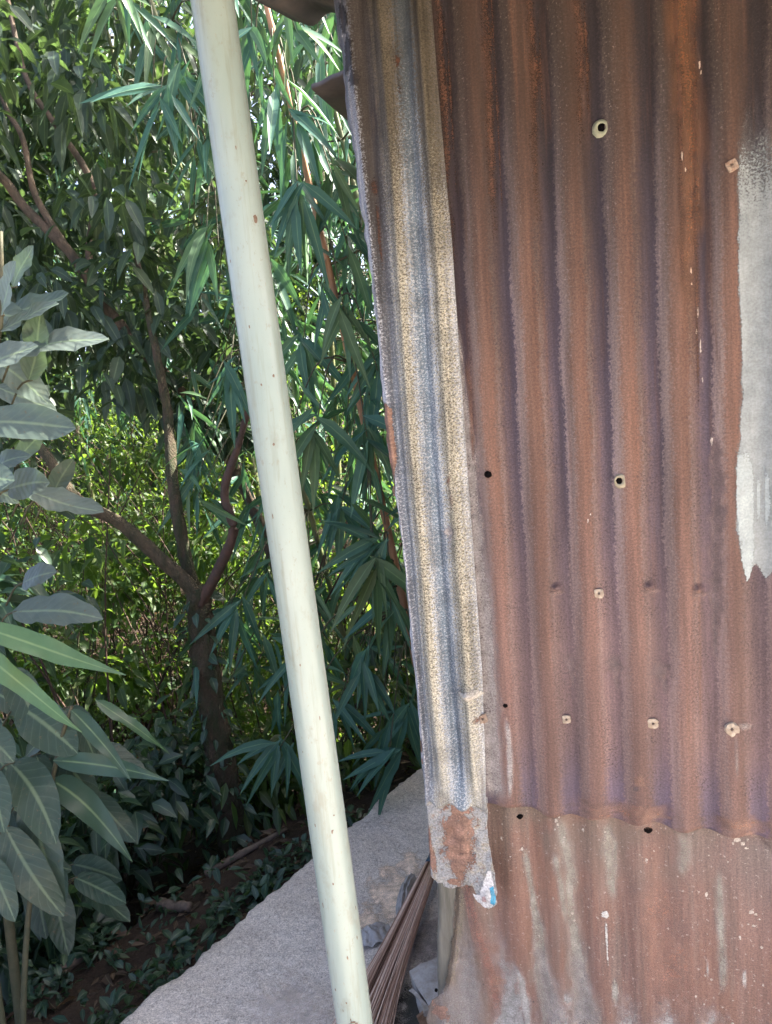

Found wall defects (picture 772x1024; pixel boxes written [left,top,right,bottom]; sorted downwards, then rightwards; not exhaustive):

corrosion [434,0,457,270]
corrosion [666,0,704,402]
peeling [735,136,772,581]
corrosion [458,335,512,793]
corrosion [359,804,530,1024]
water stain [523,823,601,1024]
water stain [604,826,617,895]
water stain [717,878,726,986]